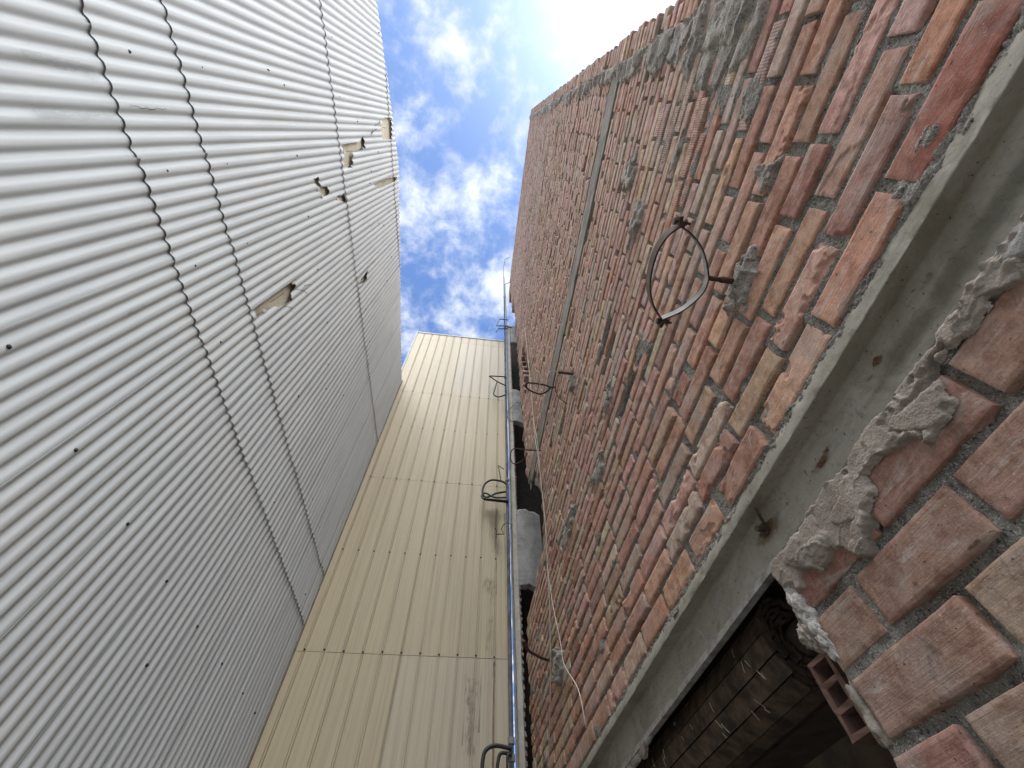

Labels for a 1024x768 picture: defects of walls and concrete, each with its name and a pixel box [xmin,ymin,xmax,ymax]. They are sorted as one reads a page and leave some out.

spalling [380,117,392,139]
spalling [342,137,365,168]
spalling [313,178,346,202]
spalling [374,177,396,188]
spalling [254,278,299,315]
flaking render [770,212,1024,662]
flaking render [845,673,899,768]